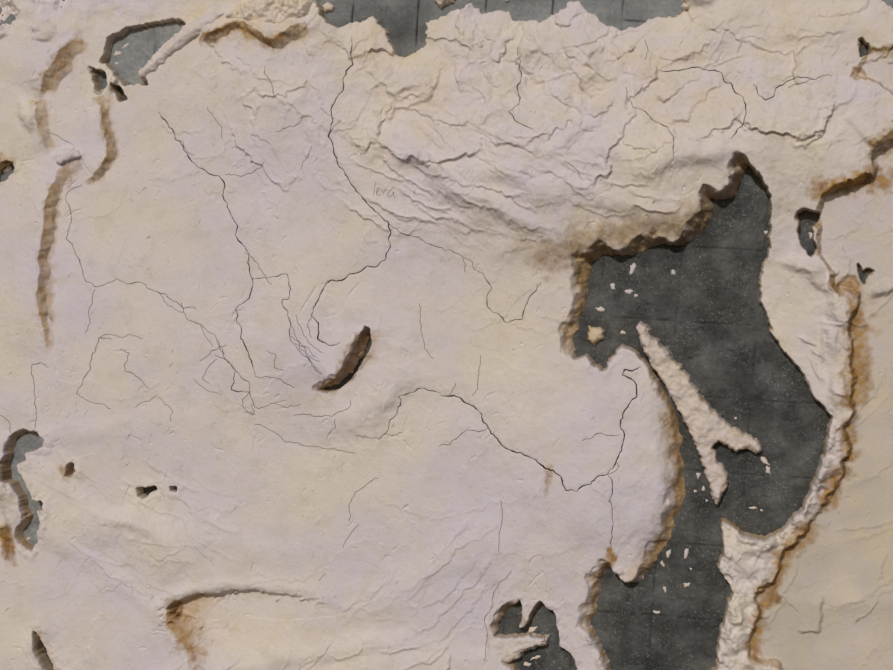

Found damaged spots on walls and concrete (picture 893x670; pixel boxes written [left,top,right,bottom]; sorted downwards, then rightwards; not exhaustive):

flaking render [0,7,16,26]
flaking render [80,21,185,188]
flaking render [0,163,15,182]
crack [65,39,640,544]
spalling [317,326,371,390]
flaking render [573,166,852,670]
flaking render [9,431,44,546]
spalling [64,463,75,478]
spalling [32,630,54,670]
flaking render [497,601,577,670]